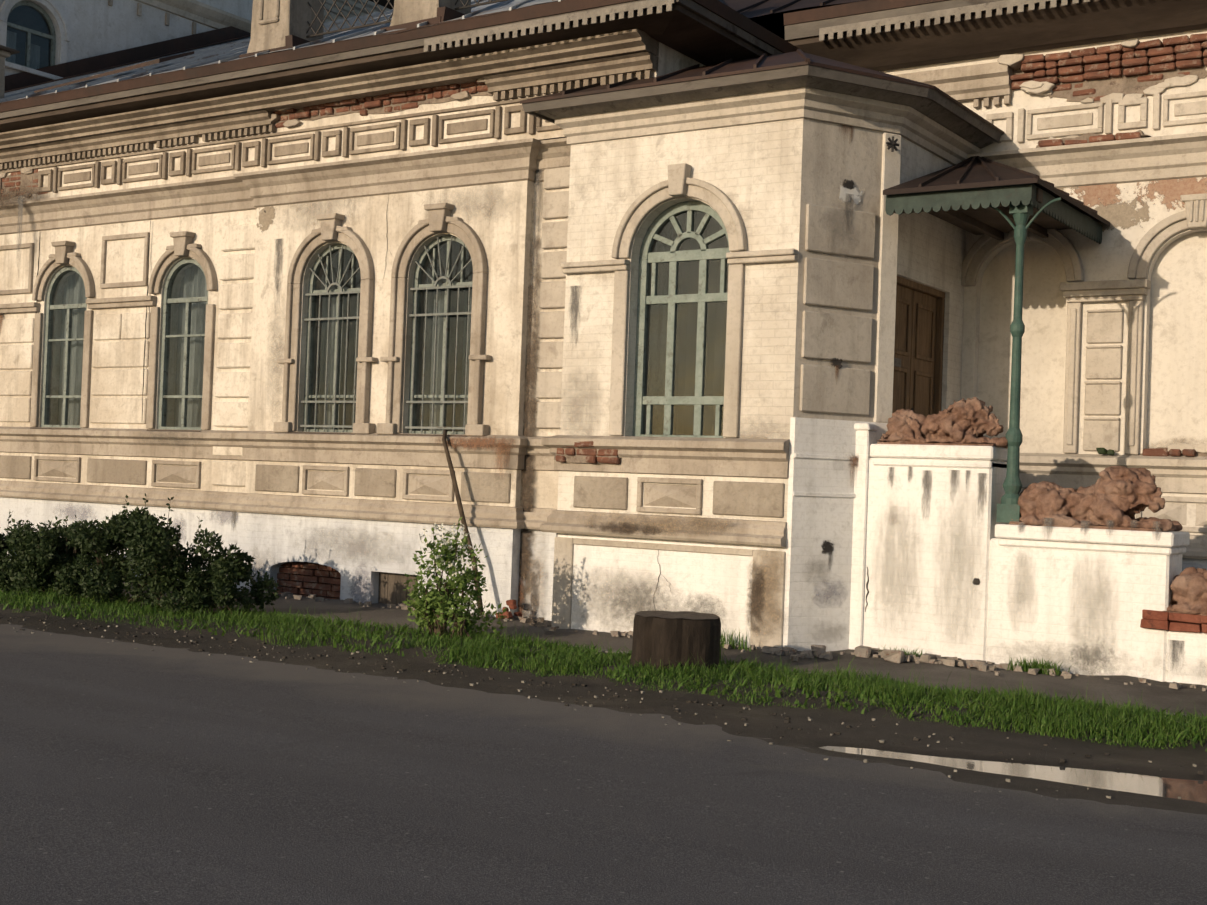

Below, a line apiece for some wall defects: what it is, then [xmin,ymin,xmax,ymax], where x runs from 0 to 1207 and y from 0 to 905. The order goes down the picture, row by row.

spalling [997,33,1207,104]
spalling [268,78,493,128]
spalling [1036,130,1151,148]
peeling [1058,177,1207,231]
spalling [554,441,621,464]
water stain [908,466,931,502]
water stain [951,470,986,505]